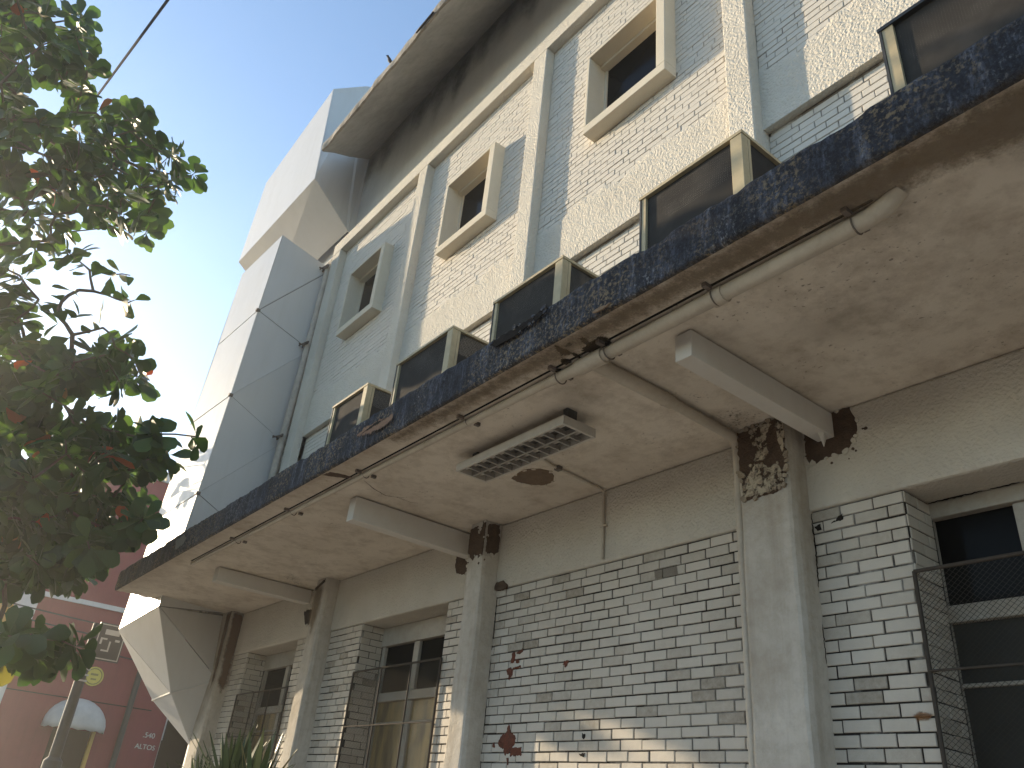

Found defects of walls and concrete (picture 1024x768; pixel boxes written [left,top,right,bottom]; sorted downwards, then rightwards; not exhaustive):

water stain [396,87,1024,439]
spalling [512,468,555,487]
peeling [735,418,789,503]
spalling [802,407,868,468]
spalling [455,519,503,575]
spalling [494,581,508,591]
peeling [507,648,523,680]
peeling [492,724,522,765]